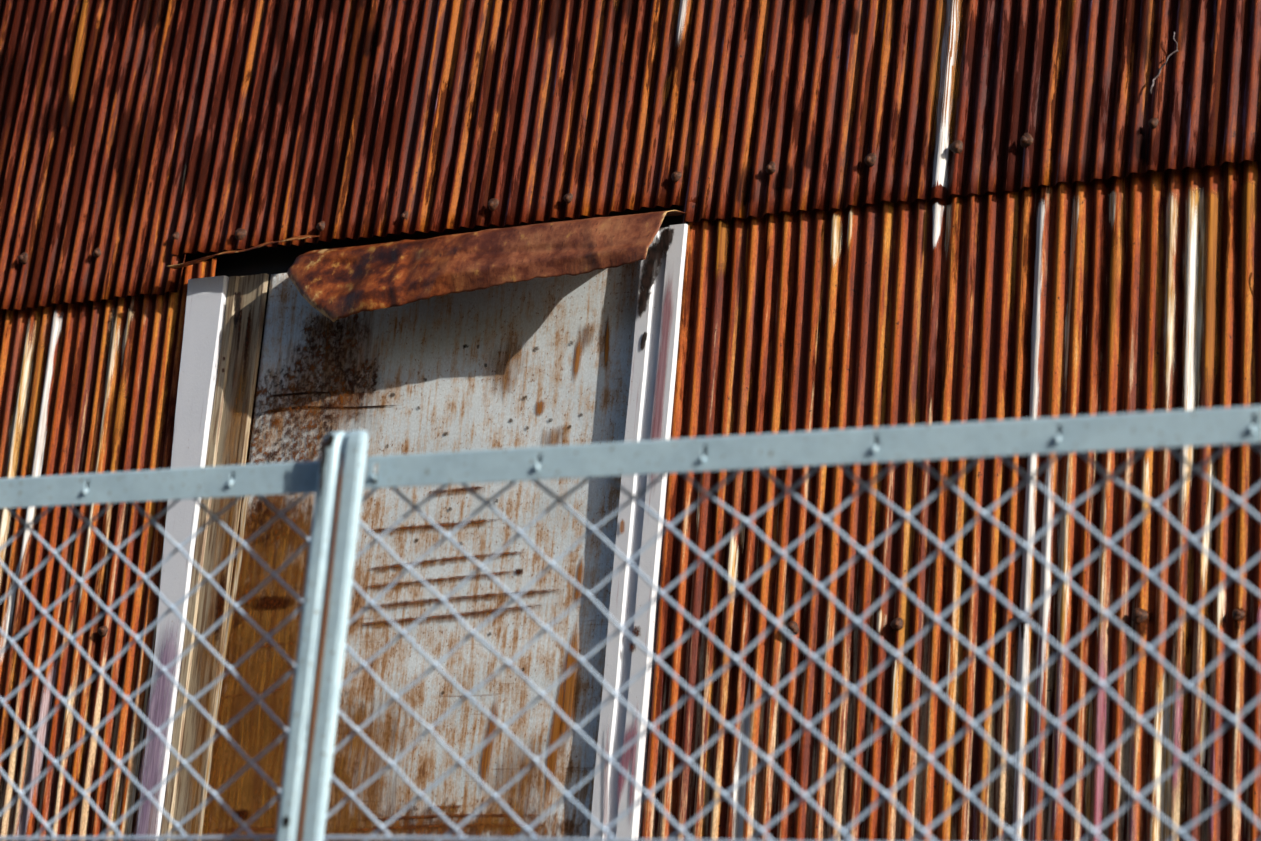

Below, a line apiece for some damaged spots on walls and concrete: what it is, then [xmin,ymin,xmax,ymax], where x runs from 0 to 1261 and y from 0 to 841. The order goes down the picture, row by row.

corrosion [69,0,87,105]
corrosion [1241,181,1256,305]
corrosion [495,345,519,389]
corrosion [573,320,609,379]
corrosion [371,519,493,535]
corrosion [430,486,482,496]
corrosion [188,310,377,841]
corrosion [352,552,555,627]
corrosion [575,560,583,602]
corrosion [324,630,578,841]